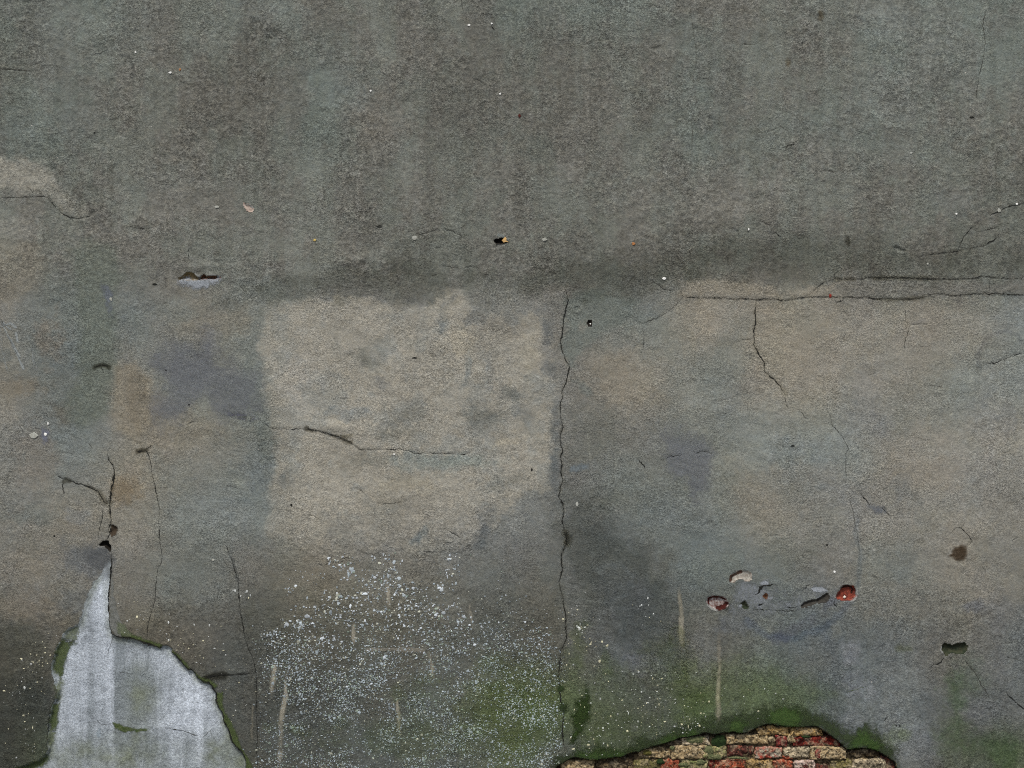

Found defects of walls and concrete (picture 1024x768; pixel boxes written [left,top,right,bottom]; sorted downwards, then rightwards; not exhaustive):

spalling [177,272,221,289]
crack [642,202,1024,562]
crack [58,443,115,537]
crack [558,292,570,745]
spalling [706,570,858,613]
peeling [19,525,252,768]
spalling [940,642,968,656]
water stain [270,665,288,760]
spalling [554,704,897,768]